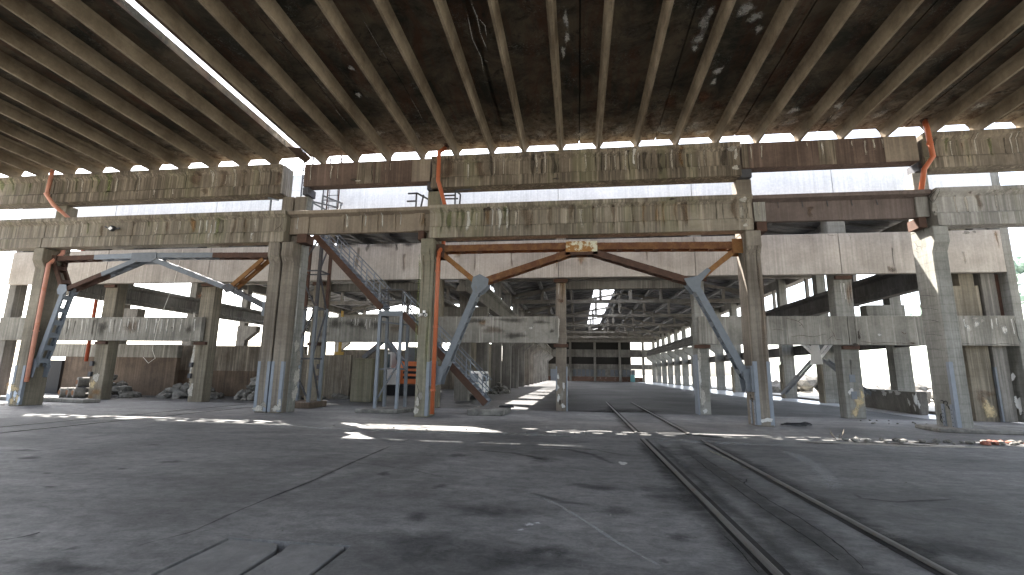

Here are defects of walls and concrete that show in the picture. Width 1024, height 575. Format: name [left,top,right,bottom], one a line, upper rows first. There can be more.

leakage [531,153,556,173]
leakage [585,149,705,171]
leakage [440,208,532,229]
spalling [251,340,301,412]